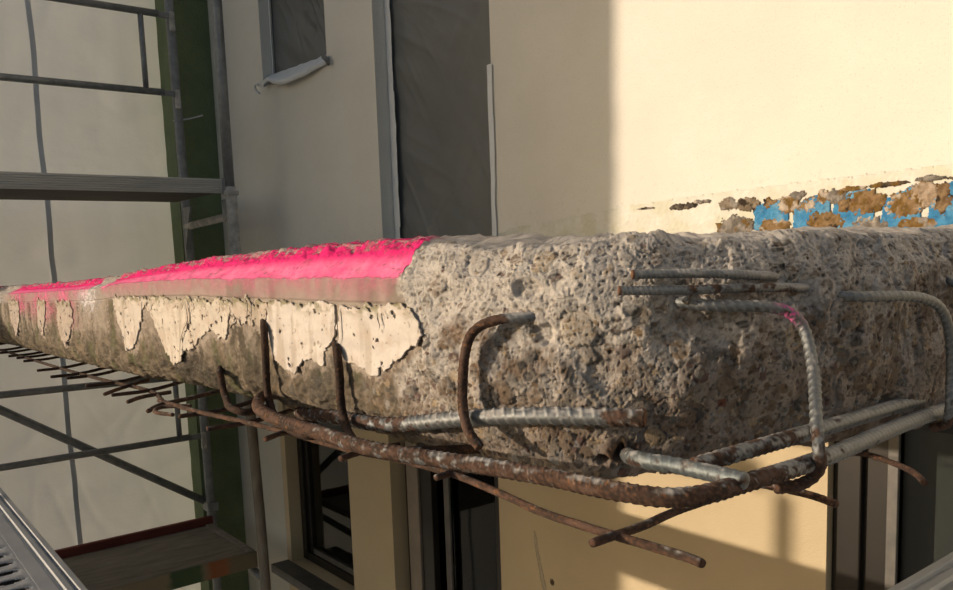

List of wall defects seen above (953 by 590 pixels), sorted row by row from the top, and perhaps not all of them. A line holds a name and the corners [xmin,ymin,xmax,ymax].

spalling [0,164,953,480]